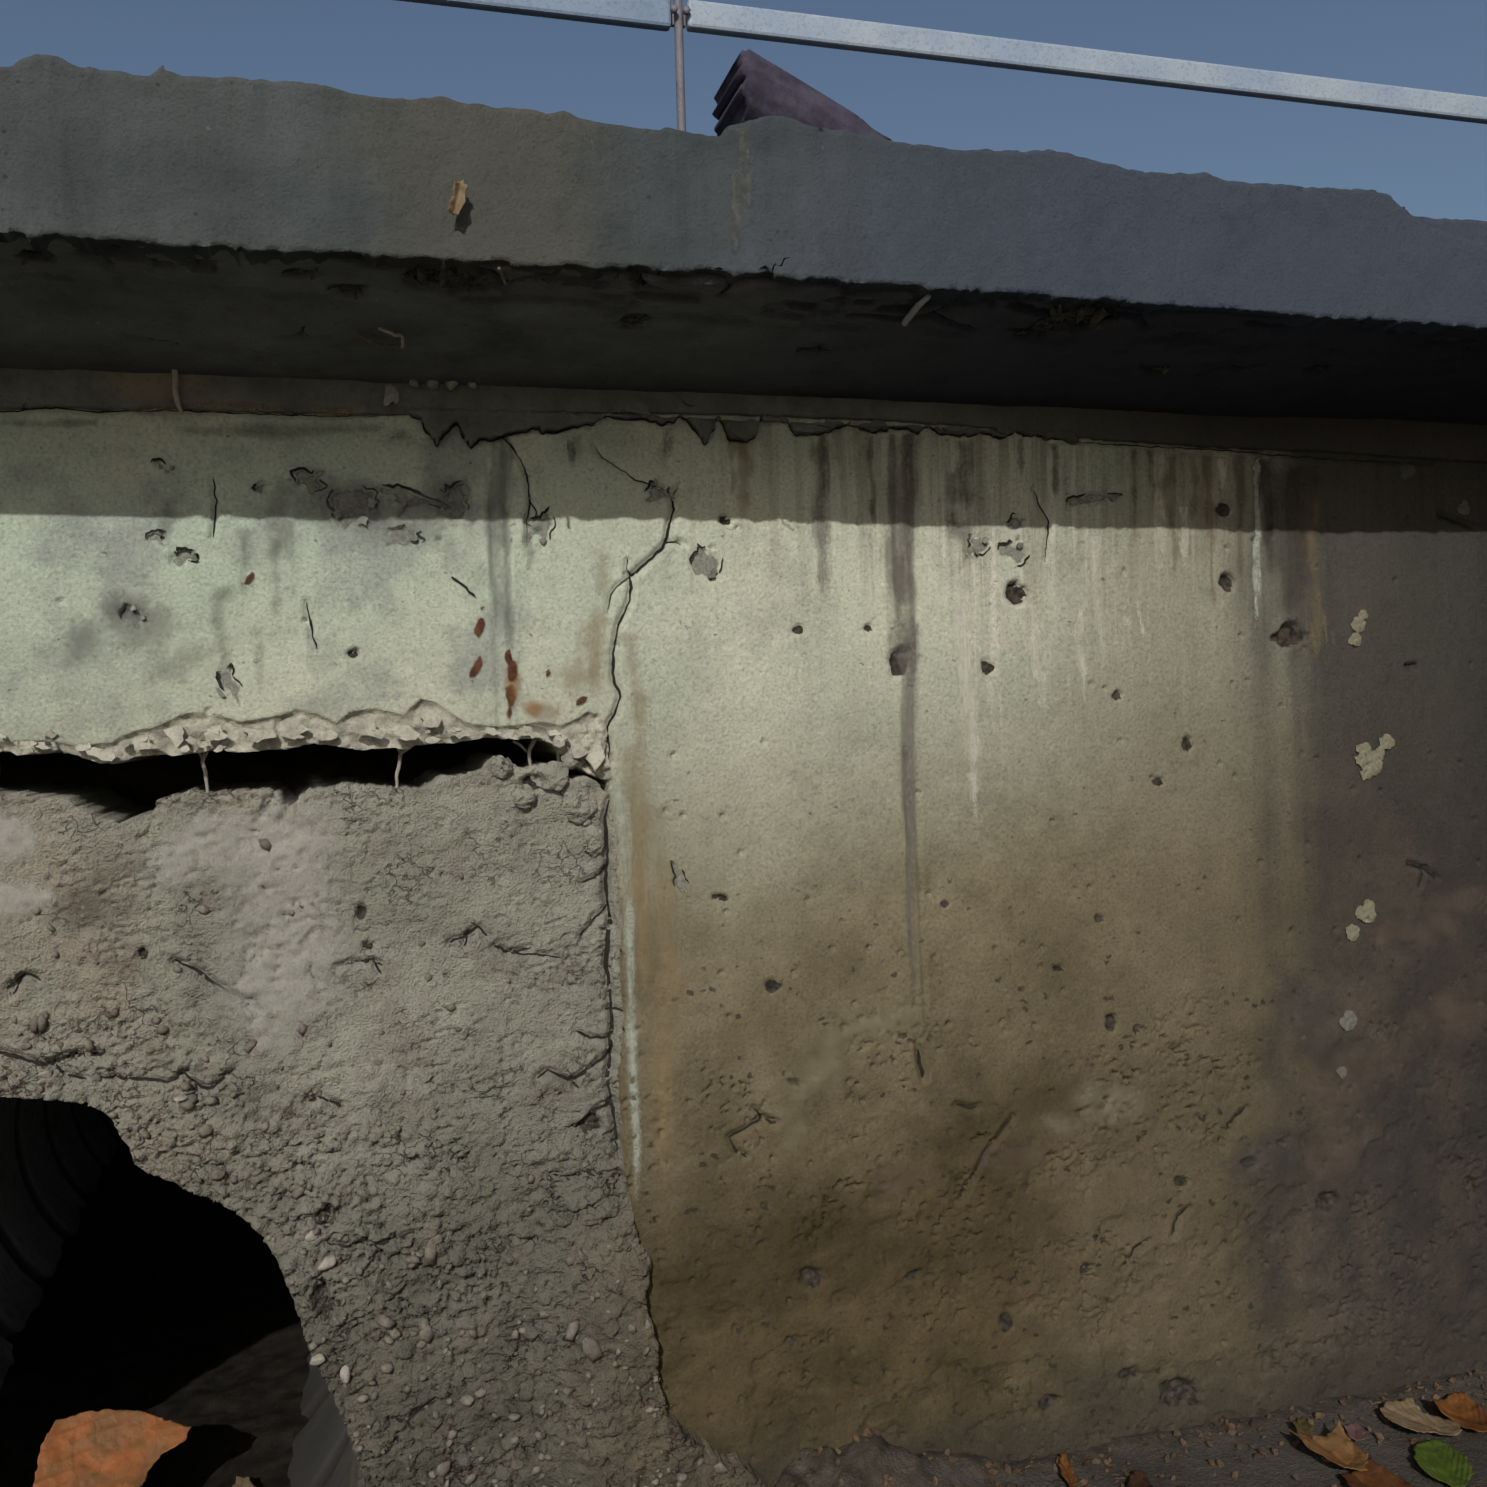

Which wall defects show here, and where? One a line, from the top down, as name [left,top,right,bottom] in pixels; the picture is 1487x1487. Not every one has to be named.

flaking render [399,397,1079,449]
spalling [289,467,470,545]
damp [812,437,827,579]
damp [1205,457,1317,616]
spalling [0,663,611,780]
corrosion [470,607,485,677]
corrosion [505,649,539,718]
crack [595,447,680,761]
damp [867,434,917,937]
spalling [522,776,539,790]
crack [449,800,623,1190]
crack [0,1051,236,1094]